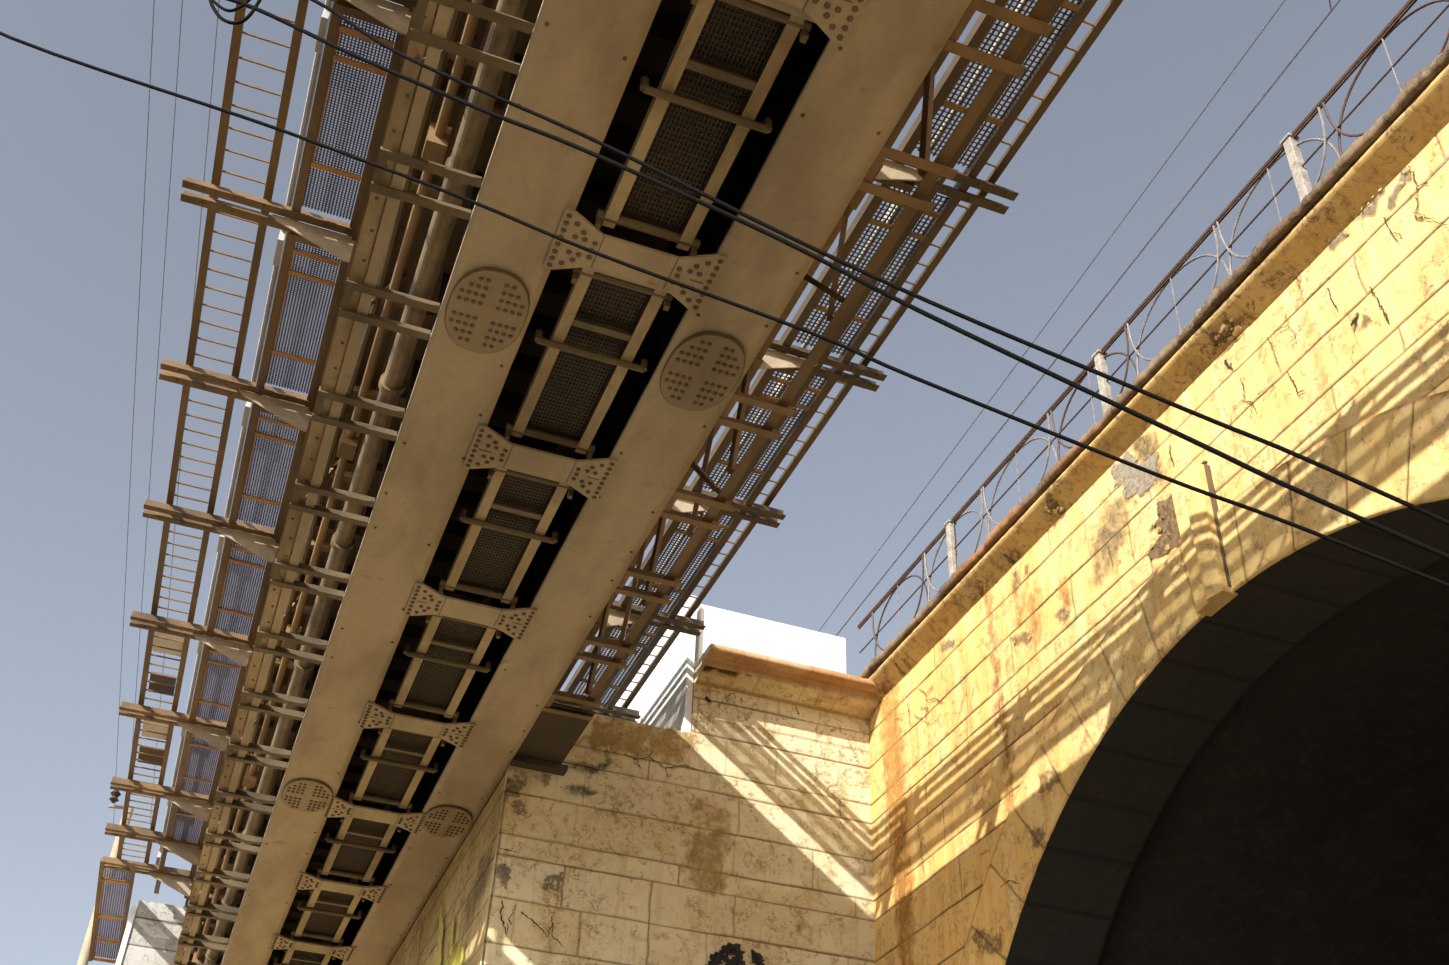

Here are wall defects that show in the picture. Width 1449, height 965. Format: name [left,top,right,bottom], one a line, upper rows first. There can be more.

crack [1383,166,1449,244]
leakage [1095,500,1124,581]
peeling [1111,450,1182,559]
rust [994,678,1013,810]
rust [879,681,914,965]